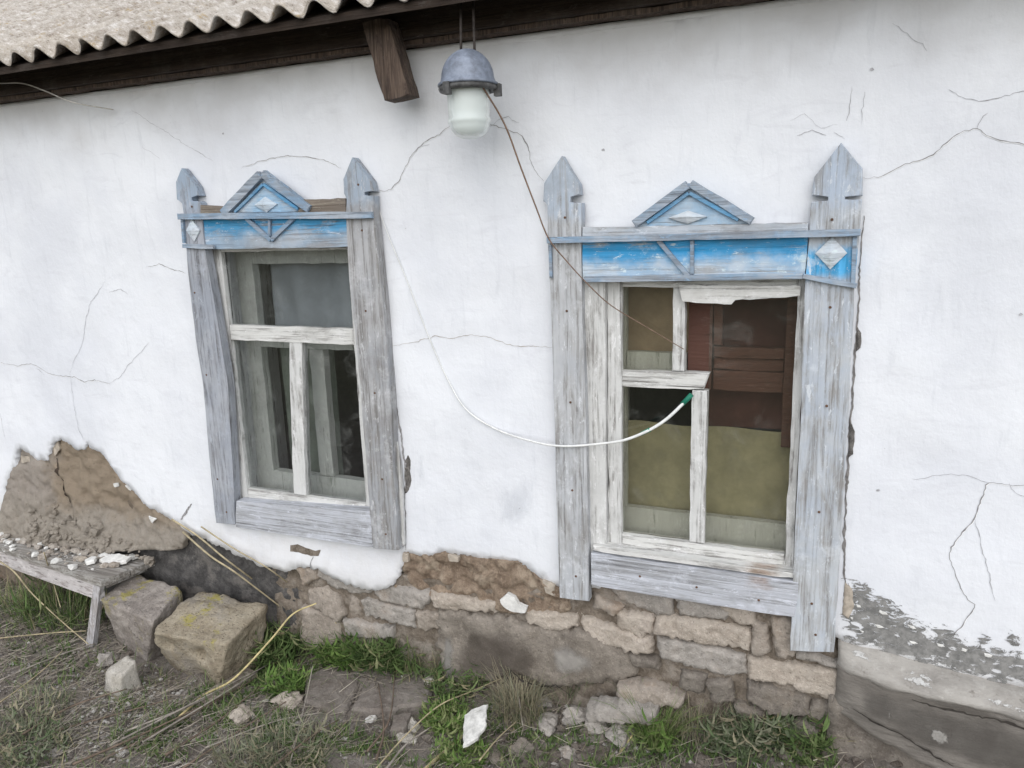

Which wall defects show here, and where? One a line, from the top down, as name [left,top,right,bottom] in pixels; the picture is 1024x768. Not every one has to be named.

crack [379,126,450,192]
crack [490,116,543,180]
crack [863,90,1024,180]
crack [3,287,147,438]
flaking render [0,439,191,567]
flaking render [394,409,572,614]
peeling [841,217,1024,688]
crack [916,474,1023,640]